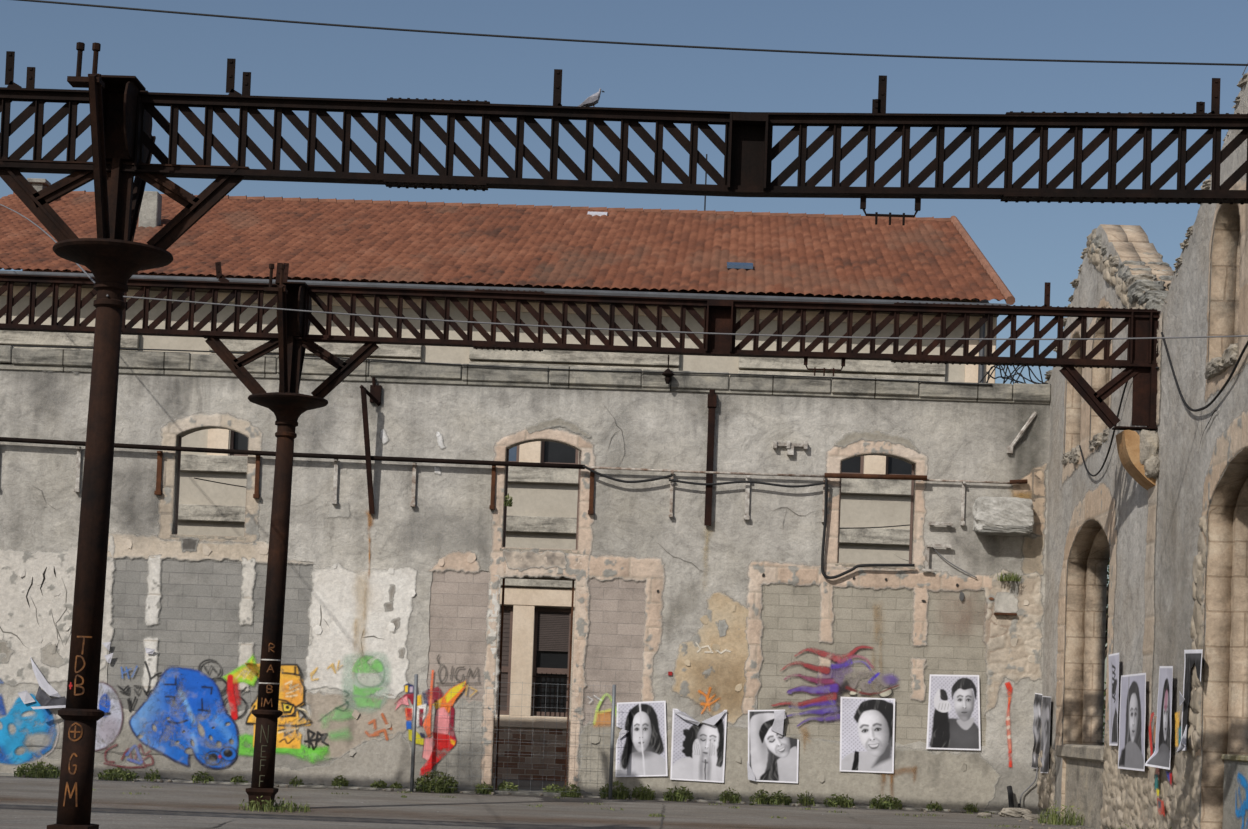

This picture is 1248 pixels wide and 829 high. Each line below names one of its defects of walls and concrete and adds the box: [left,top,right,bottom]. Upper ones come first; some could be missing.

spalling [0,756,61,774]
peeling [0,545,78,686]
spalling [93,761,252,782]
peeling [100,532,269,670]
peeling [274,551,480,788]
spalling [578,592,1001,810]